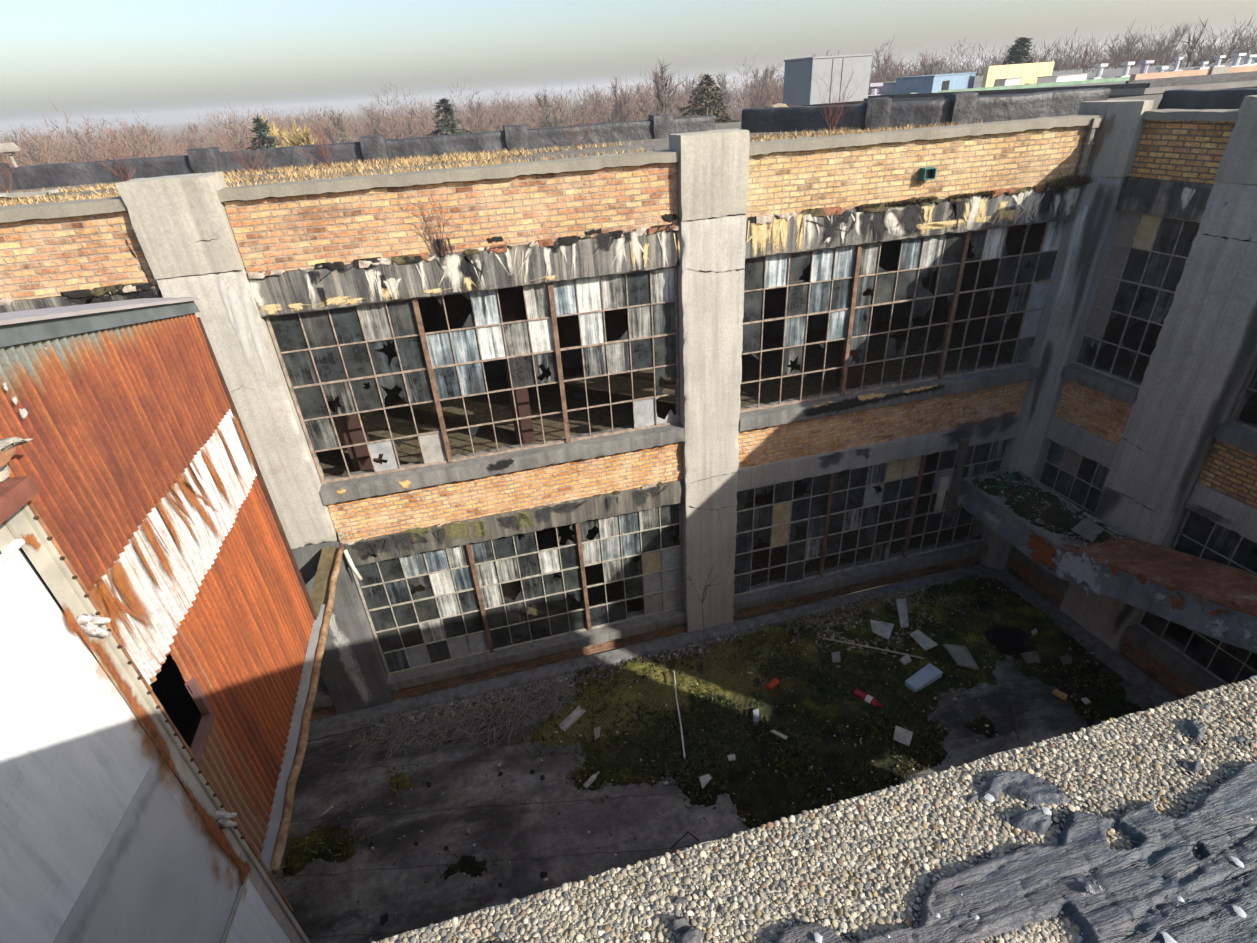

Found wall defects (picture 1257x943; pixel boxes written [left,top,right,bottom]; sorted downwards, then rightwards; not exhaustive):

damp [416,238,575,315]
damp [594,231,681,272]
damp [747,179,1211,316]
damp [220,264,401,379]
rust [217,427,243,480]
rust [234,416,255,468]
rust [131,449,231,587]
rust [1026,530,1057,570]
peeling [1052,548,1110,595]
rust [22,504,293,912]
peeling [1082,880,1103,895]
peeling [979,911,1083,943]